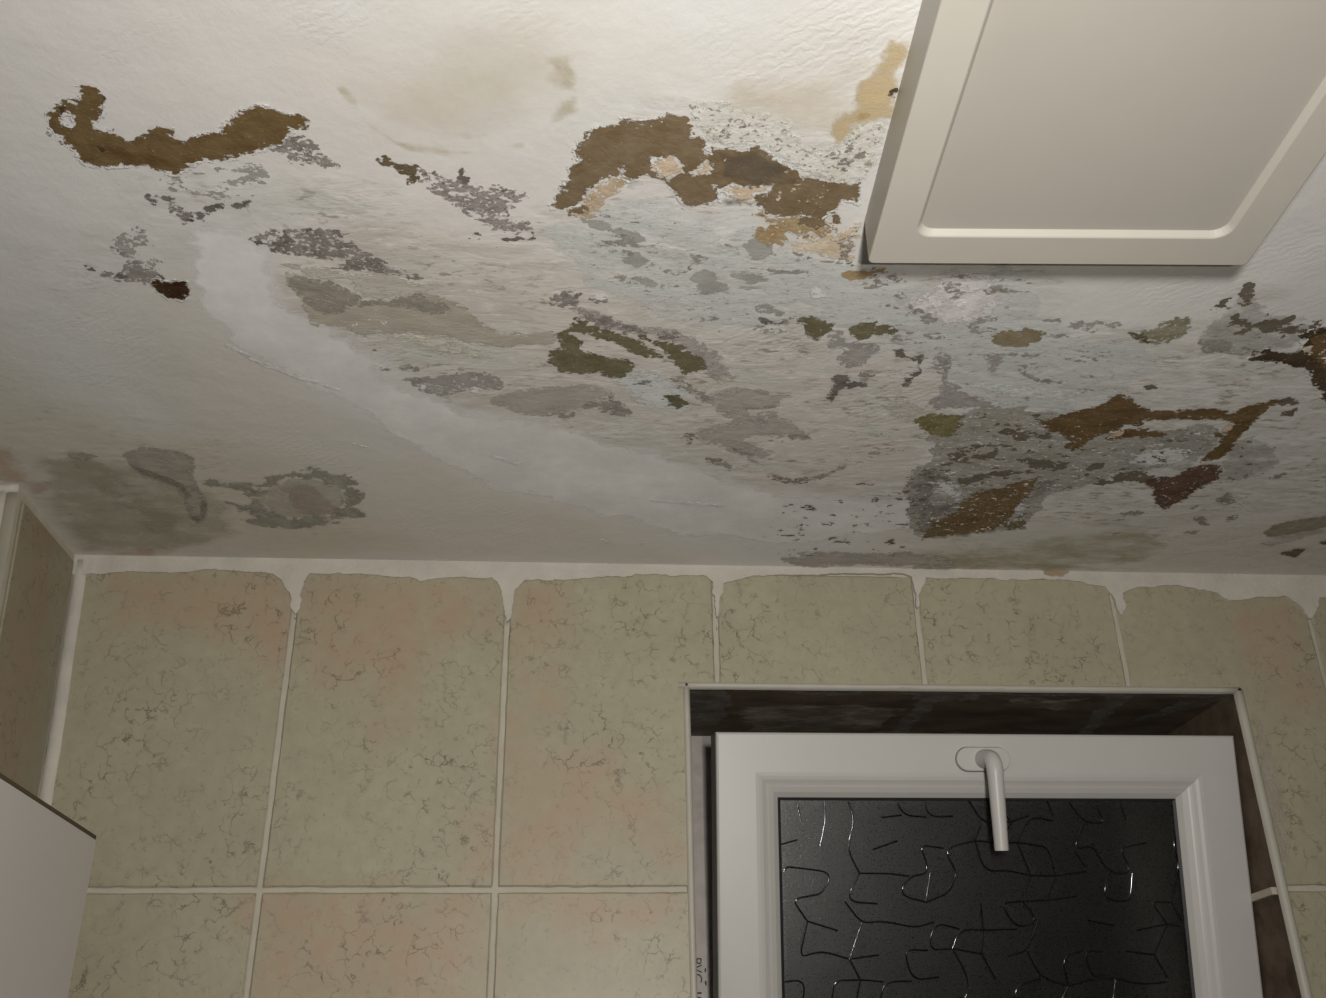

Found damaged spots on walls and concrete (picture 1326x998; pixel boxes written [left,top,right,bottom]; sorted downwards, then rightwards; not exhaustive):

water stain [834,41,906,141]
spalling [84,226,192,302]
peeling [44,85,341,225]
peeling [248,228,424,280]
peeling [375,155,536,242]
peeling [548,101,1047,347]
peeling [380,290,740,418]
peeling [755,303,899,403]
peeling [1068,282,1326,401]
water stain [47,460,366,553]
peeling [901,384,1299,541]
peeling [1280,541,1326,558]